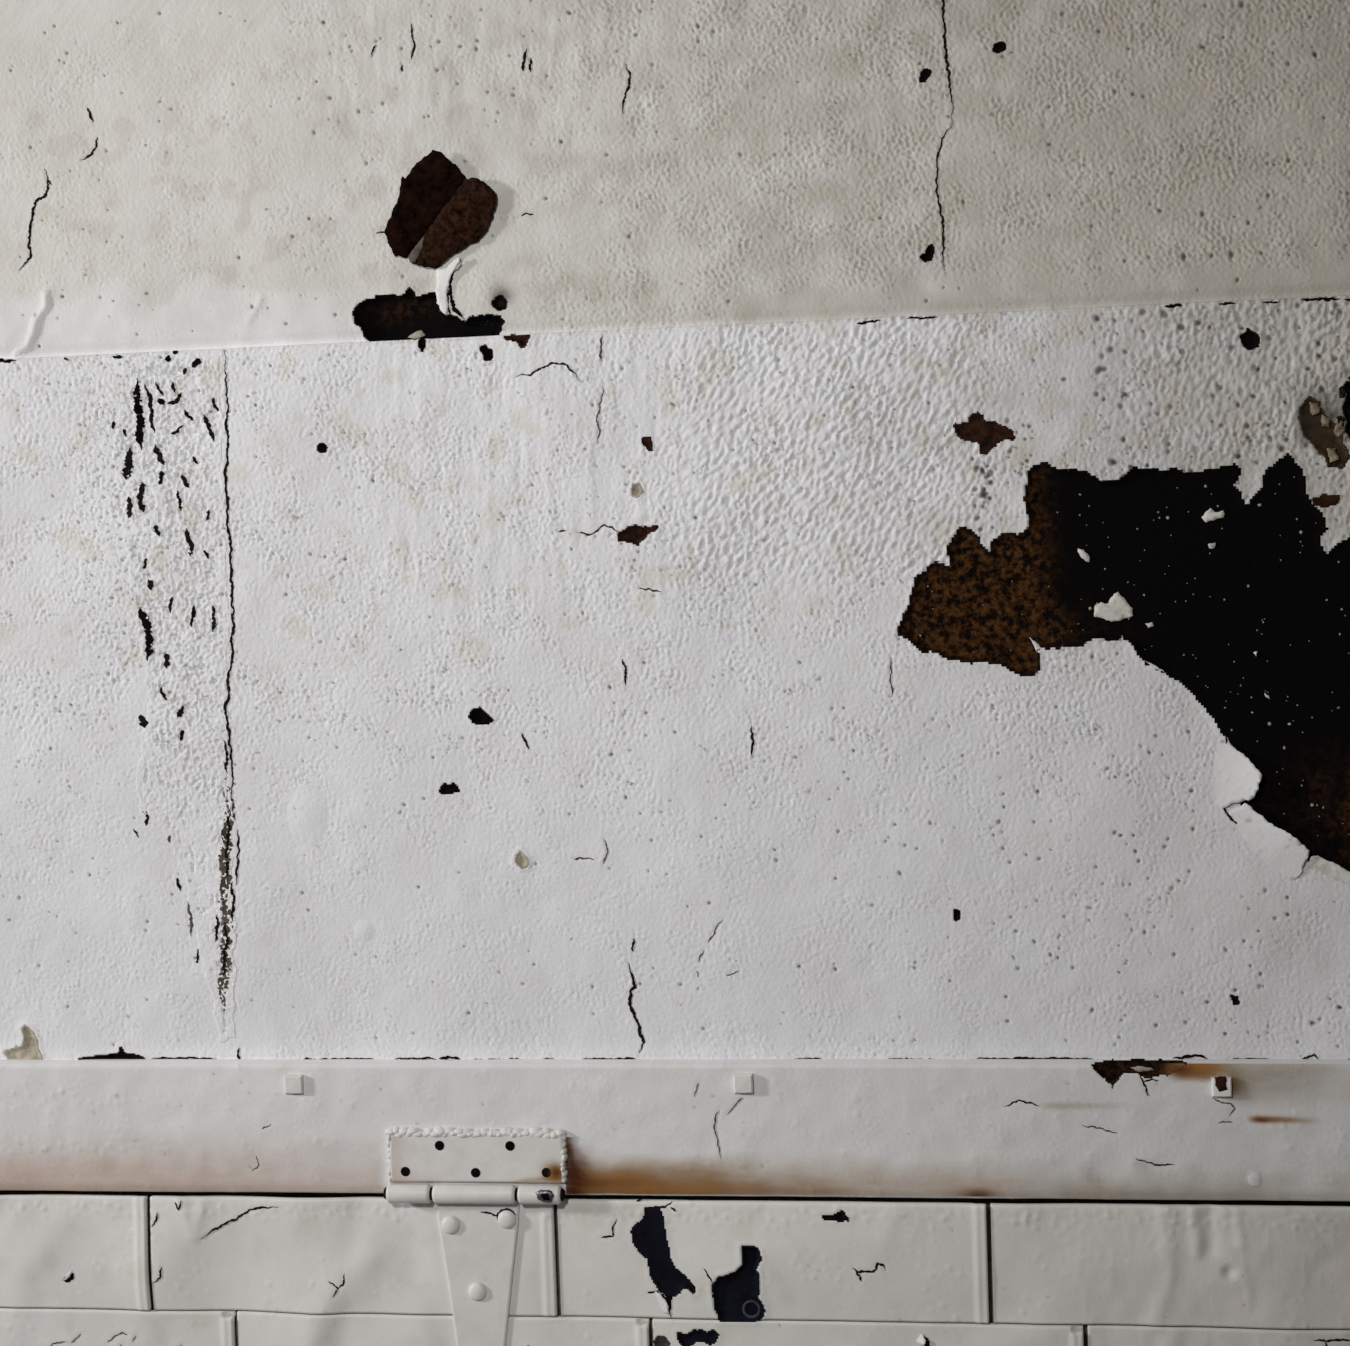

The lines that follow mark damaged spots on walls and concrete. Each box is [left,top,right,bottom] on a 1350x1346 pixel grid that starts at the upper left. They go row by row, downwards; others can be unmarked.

crack [935,0,954,265]
peeling [352,149,530,361]
peeling [953,411,1015,454]
spalling [1336,376,1350,438]
crack [223,350,240,885]
peeling [897,453,1350,886]
crack [628,939,645,1052]
peeling [1091,1059,1187,1085]
rust [1171,1063,1242,1092]
rust [541,1137,844,1195]
peeling [630,1206,695,1314]
peeling [653,1246,765,1346]